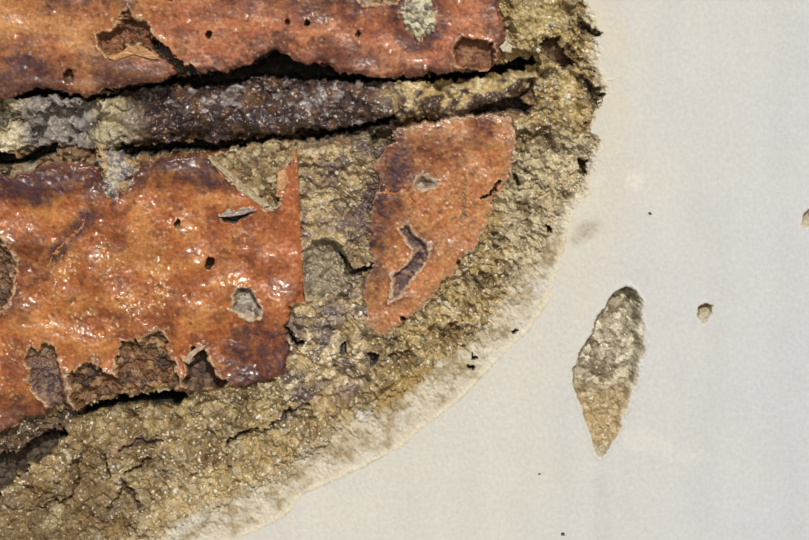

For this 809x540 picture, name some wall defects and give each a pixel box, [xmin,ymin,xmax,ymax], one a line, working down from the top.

crack [13,40,542,104]
crack [471,96,536,117]
crack [0,142,62,169]
crack [121,114,399,160]
spalling [800,207,809,231]
spalling [0,0,614,540]
spalling [695,301,716,327]
spalling [570,284,649,461]
crack [0,389,189,498]
crack [225,402,311,449]
crack [22,453,84,513]
crack [102,435,164,514]